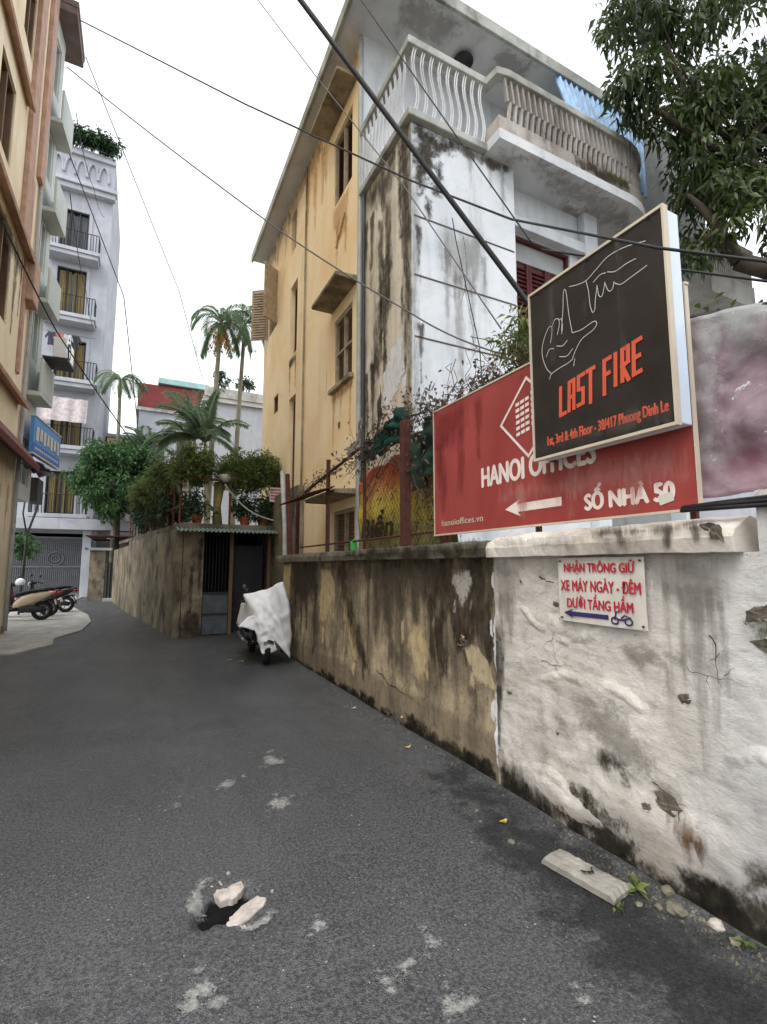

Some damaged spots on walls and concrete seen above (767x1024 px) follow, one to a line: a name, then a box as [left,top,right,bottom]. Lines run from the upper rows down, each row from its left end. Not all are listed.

leakage [365,147,402,429]
spalling [697,522,724,543]
leakage [362,559,473,677]
spalling [743,605,767,625]
leakage [485,629,493,667]
crack [687,635,746,689]
spalling [749,636,767,653]
leakage [280,649,767,947]
spalling [641,791,683,817]